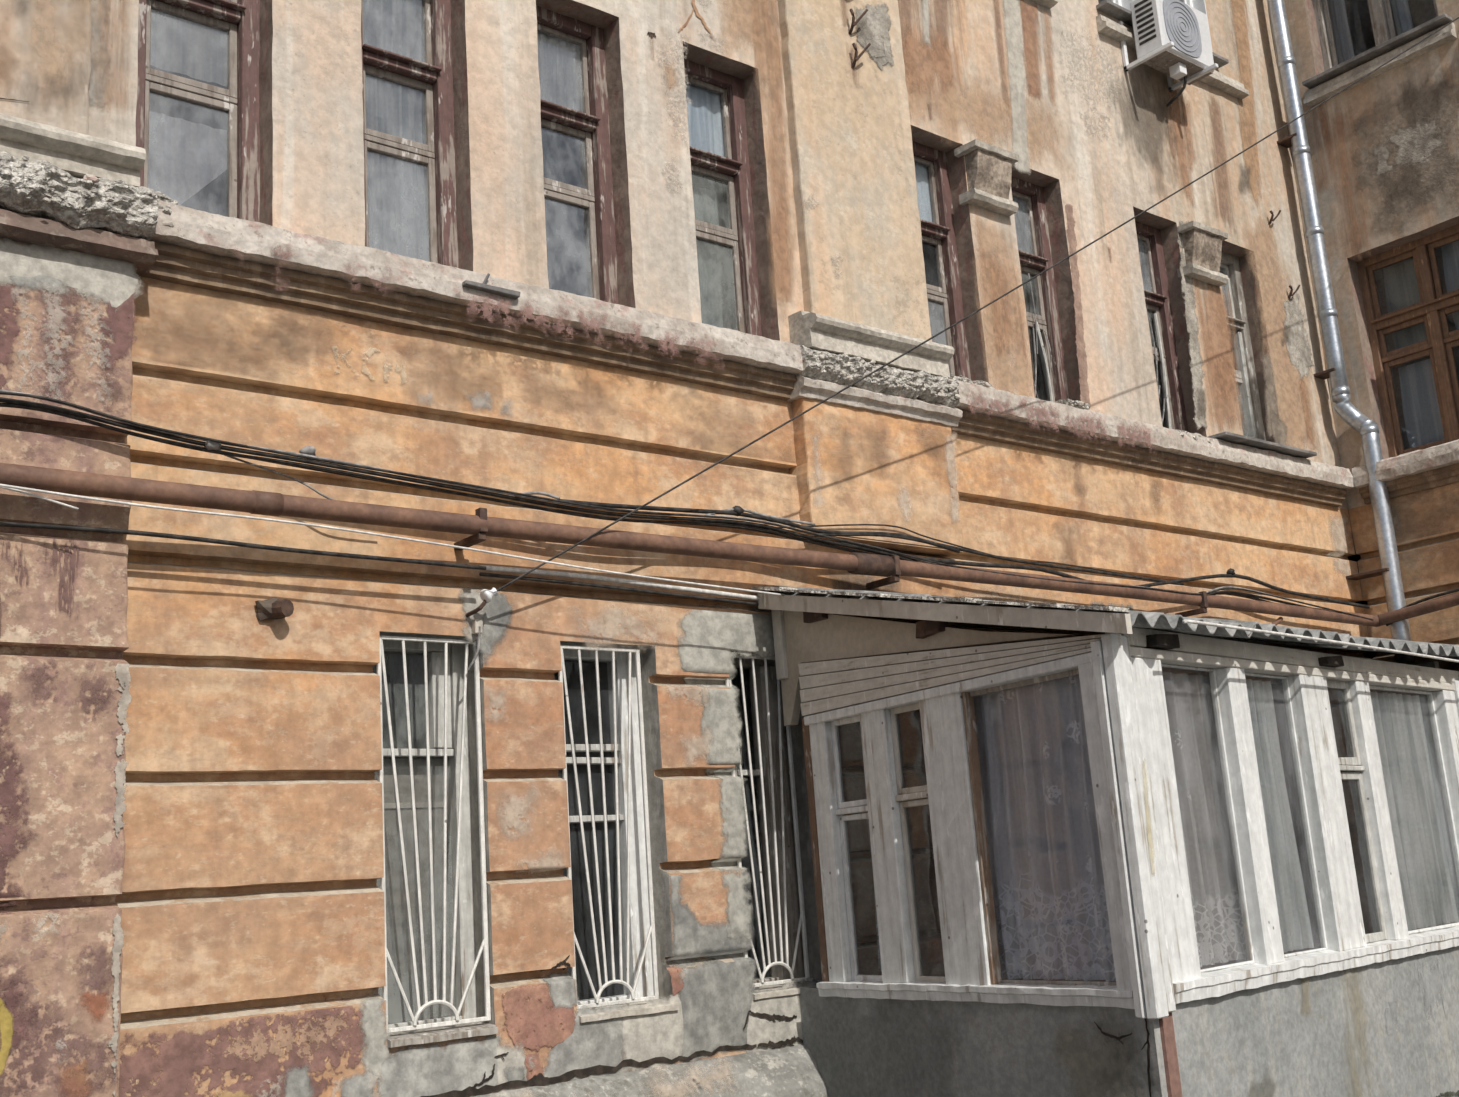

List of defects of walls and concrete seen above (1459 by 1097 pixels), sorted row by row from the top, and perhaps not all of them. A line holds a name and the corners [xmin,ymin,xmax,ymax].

crack [678,0,713,38]
flaking render [855,3,894,70]
water stain [898,0,1056,172]
spalling [0,151,178,240]
spalling [796,204,1152,447]
peeling [459,588,485,641]
peeling [0,695,32,915]
spalling [78,664,132,837]
peeling [0,914,366,1097]
peeling [502,984,576,1097]
peeling [666,965,684,996]